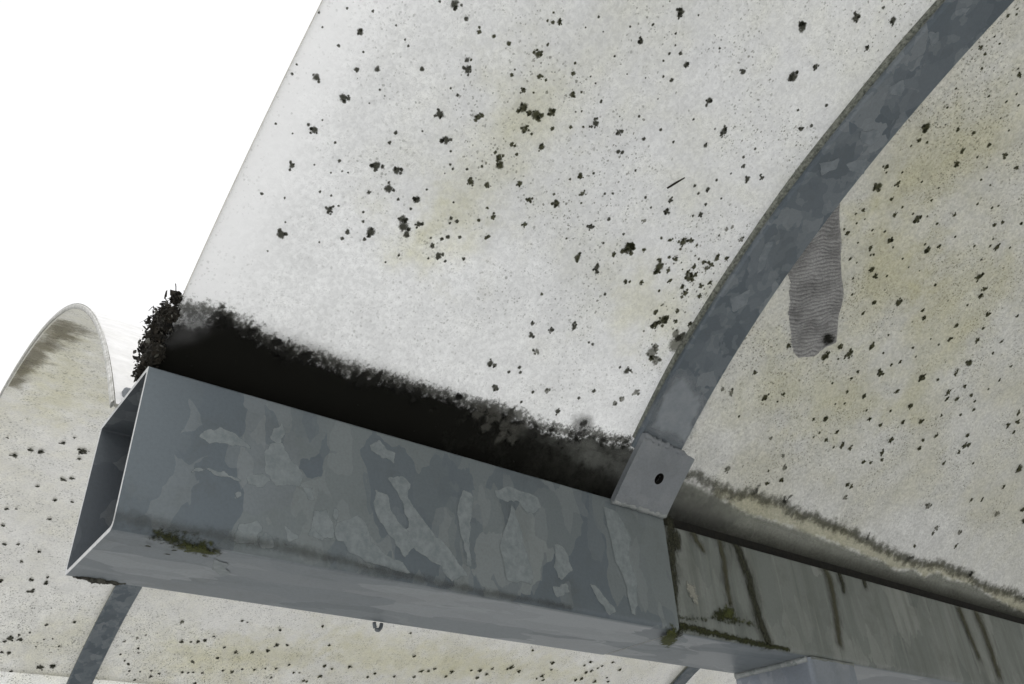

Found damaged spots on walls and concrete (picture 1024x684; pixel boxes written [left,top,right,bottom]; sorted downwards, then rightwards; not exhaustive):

leakage [438,0,511,46]
leakage [662,7,689,68]
leakage [494,87,556,169]
leakage [439,136,491,188]
leakage [369,162,428,238]
leakage [873,164,939,225]
leakage [427,216,462,263]
leakage [602,233,646,257]
leakage [623,237,729,366]
leakage [821,334,853,361]
leakage [918,360,976,416]
leakage [667,454,1024,646]